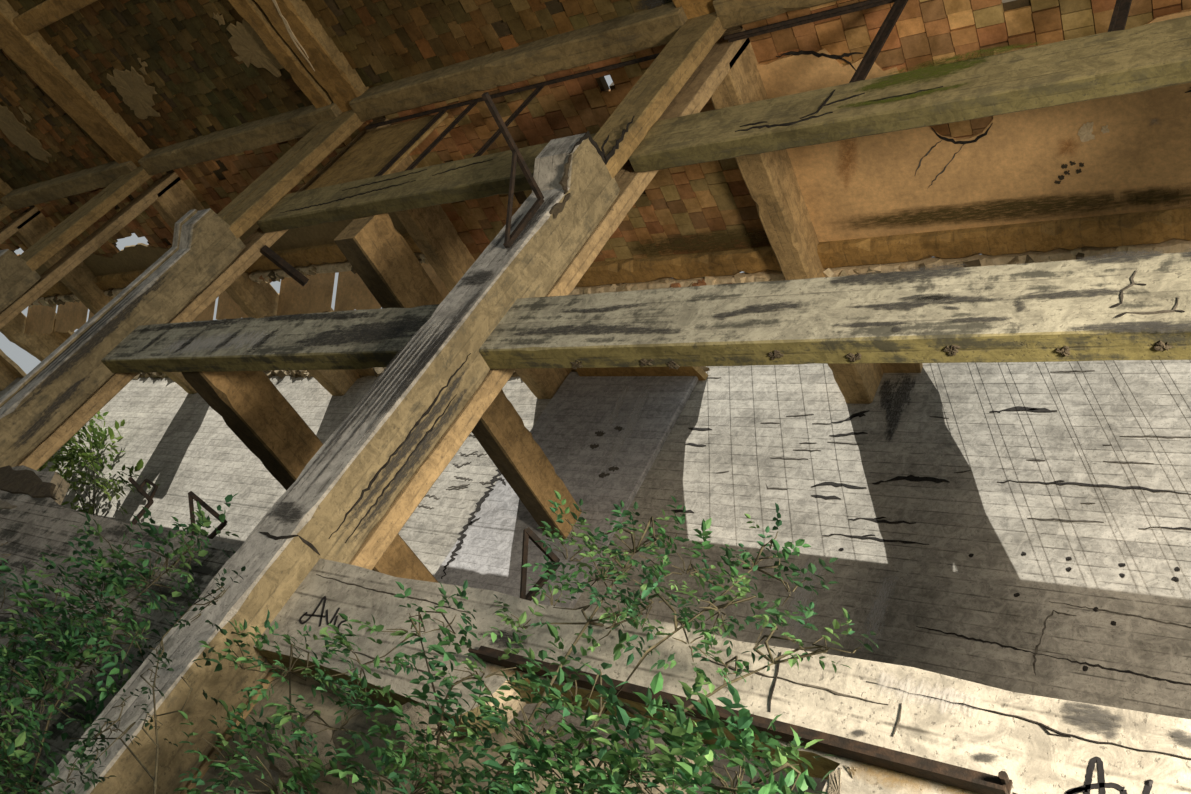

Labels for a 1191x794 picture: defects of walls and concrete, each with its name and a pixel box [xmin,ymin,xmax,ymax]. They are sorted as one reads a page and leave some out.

peeling [212,13,284,77]
peeling [272,0,315,71]
peeling [107,58,160,120]
crack [735,50,943,132]
peeling [0,105,52,163]
crack [569,115,635,165]
crack [915,123,993,188]
damp [852,187,1191,227]
crack [1110,270,1185,318]
crack [260,353,506,614]
crack [916,601,1191,686]
crack [701,652,1191,760]